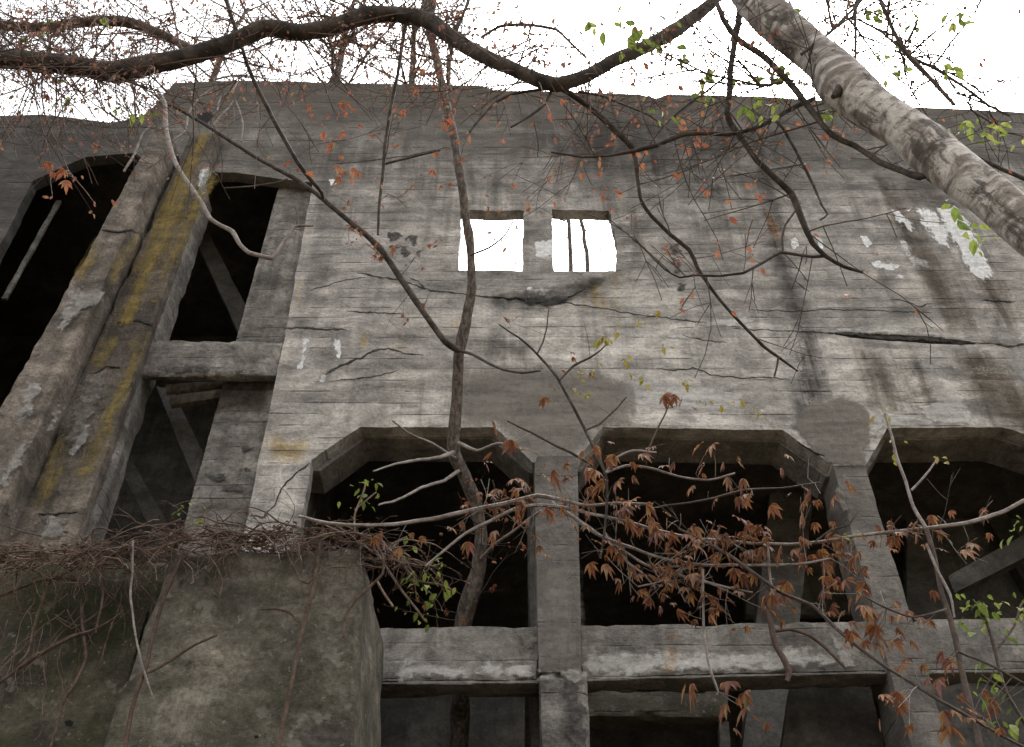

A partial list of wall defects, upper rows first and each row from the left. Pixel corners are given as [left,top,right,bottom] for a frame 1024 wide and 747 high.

water stain [121,135,213,324]
water stain [871,206,994,280]
crack [310,273,536,303]
crack [565,289,1024,348]
crack [326,348,421,381]